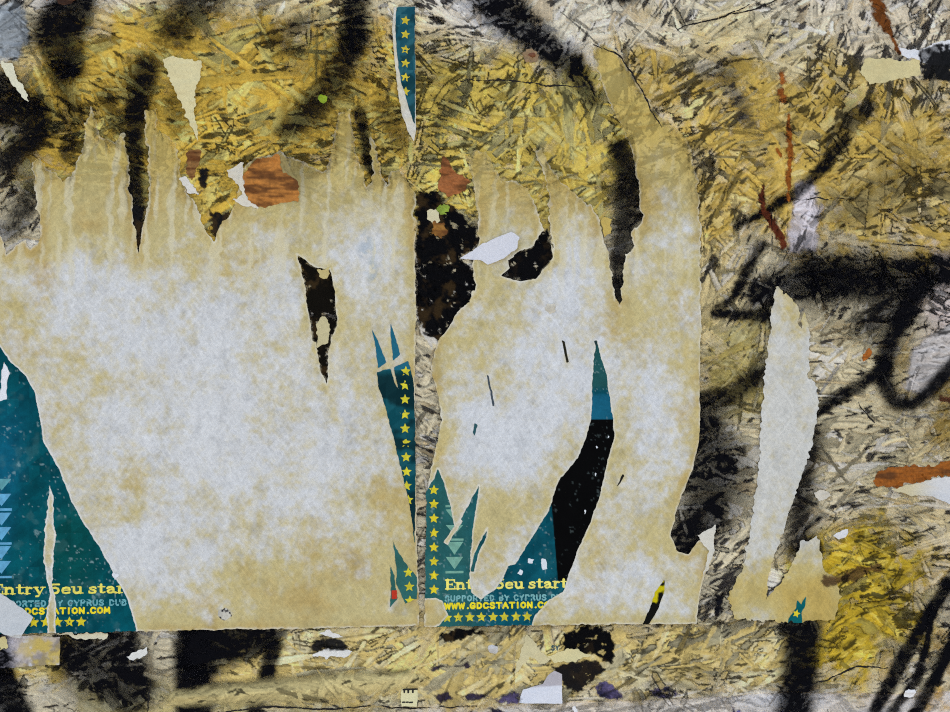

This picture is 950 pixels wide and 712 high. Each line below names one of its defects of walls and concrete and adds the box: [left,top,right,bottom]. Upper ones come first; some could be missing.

peeling [186,149,201,180]
peeling [243,154,299,208]
peeling [438,156,471,197]
peeling [431,220,448,238]